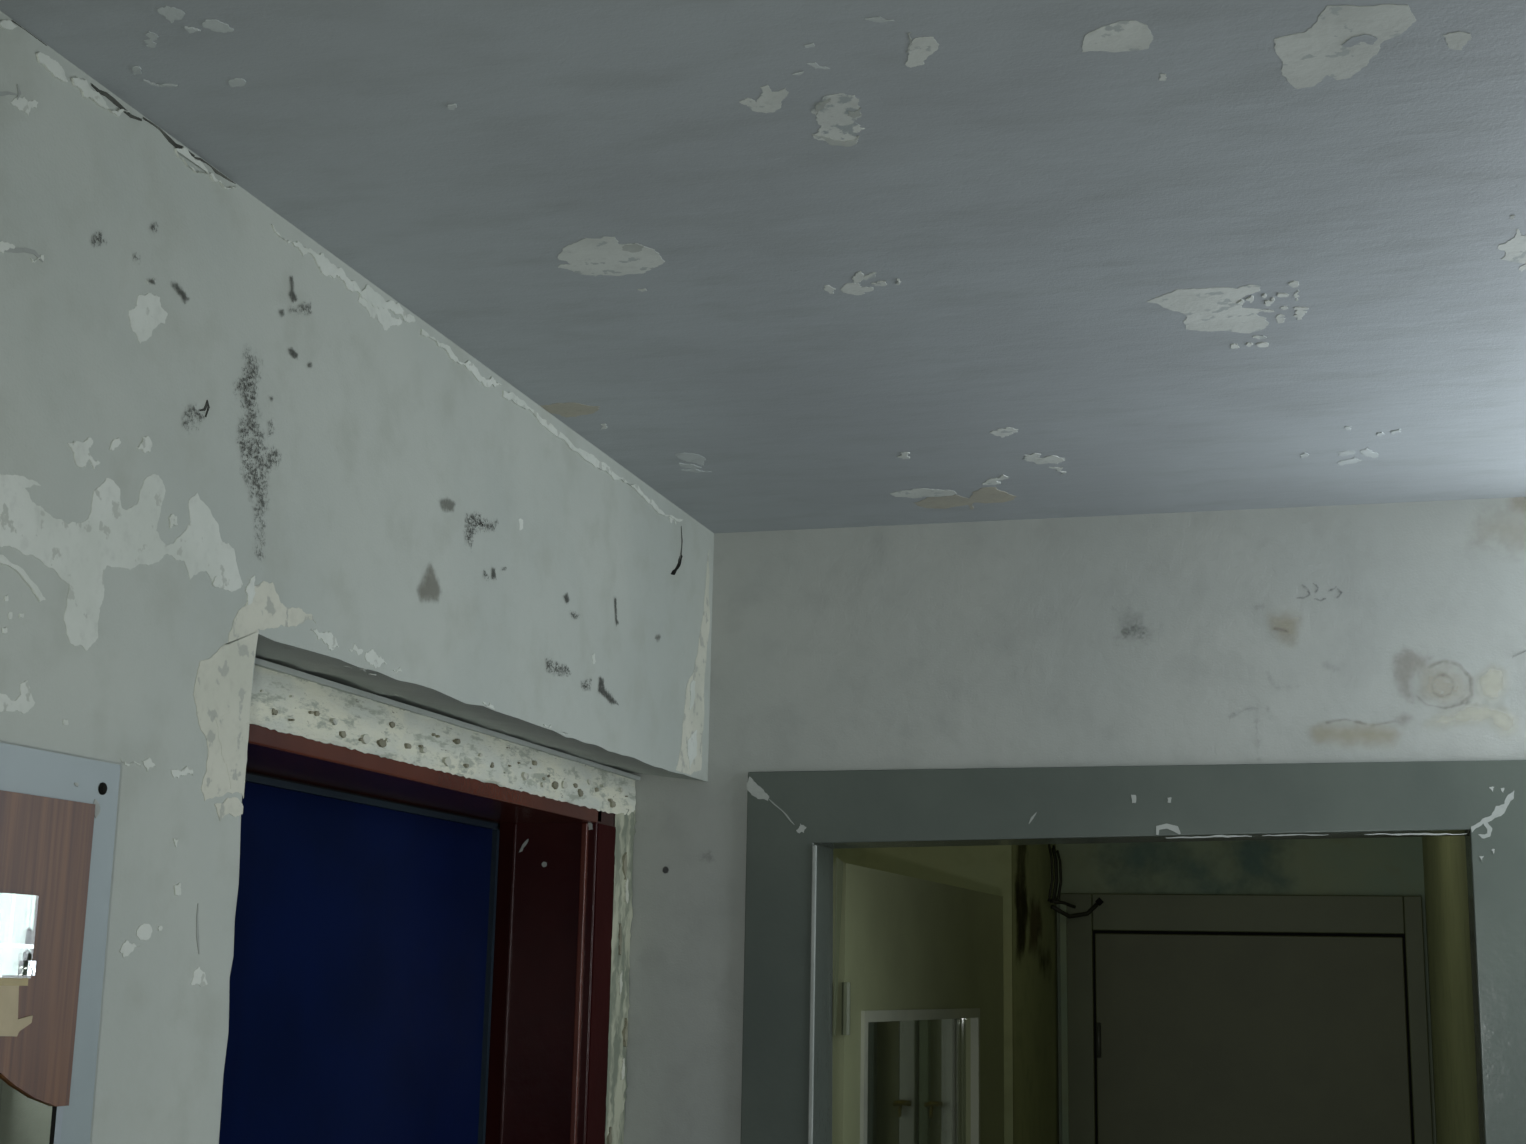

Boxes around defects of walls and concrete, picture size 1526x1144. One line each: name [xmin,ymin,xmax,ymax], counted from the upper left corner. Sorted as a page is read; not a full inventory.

peeling [1082,21,1153,52]
peeling [1274,4,1416,89]
peeling [811,93,865,147]
peeling [558,237,665,292]
peeling [1498,215,1526,272]
peeling [128,278,168,344]
peeling [1147,281,1309,349]
damp [237,354,277,518]
flaking render [0,436,641,1144]
peeling [1156,824,1328,838]
peeling [1364,786,1514,860]
damp [1016,845,1048,968]